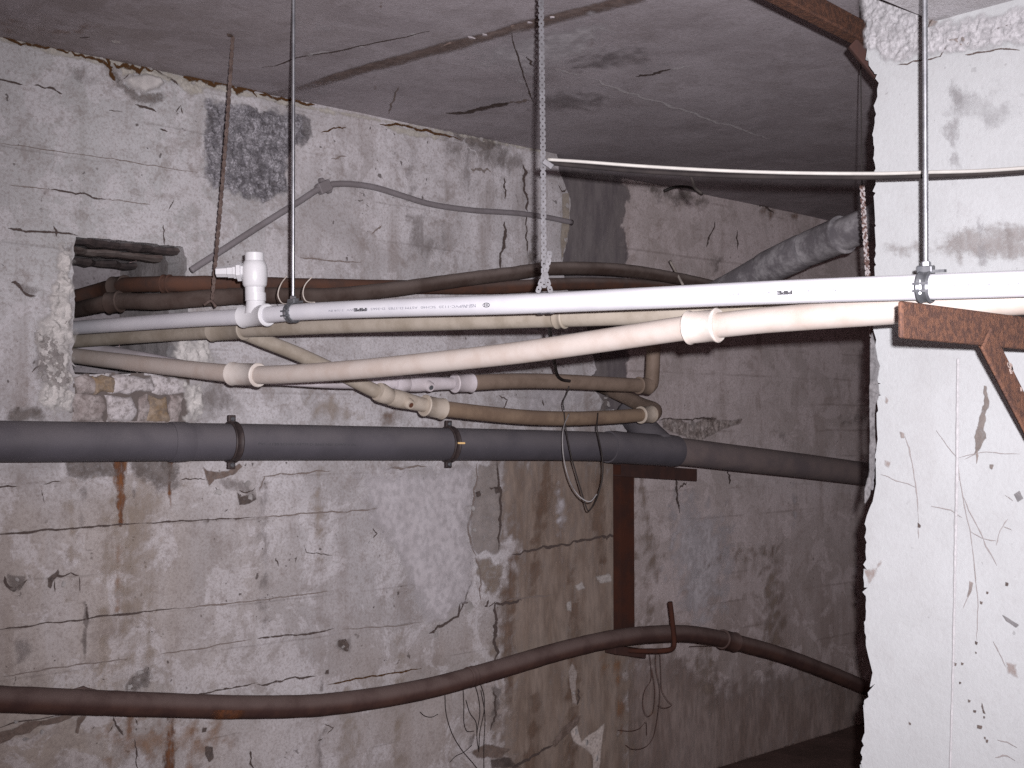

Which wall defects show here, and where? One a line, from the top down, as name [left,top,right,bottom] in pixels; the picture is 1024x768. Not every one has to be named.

leakage [0,37,541,159]
leakage [485,26,604,82]
crack [380,35,768,140]
spalling [862,0,1024,65]
crack [8,185,174,245]
flaking render [32,242,190,423]
spalling [48,570,80,590]
rust [113,461,127,526]
crack [0,508,377,538]
peeling [467,464,502,599]
leakage [490,460,614,658]
crack [162,581,552,660]